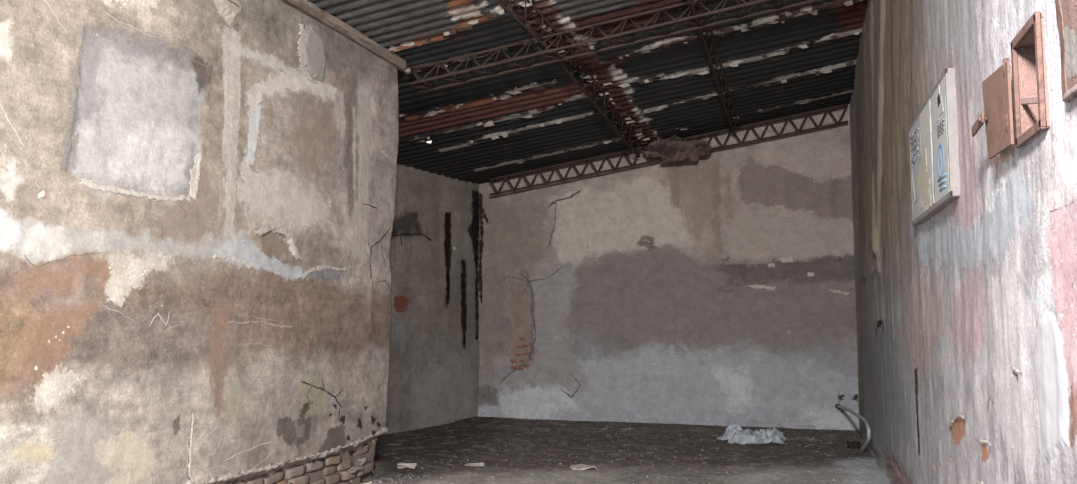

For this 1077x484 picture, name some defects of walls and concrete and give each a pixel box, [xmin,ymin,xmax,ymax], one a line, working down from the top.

peeling [385,3,505,54]
rust [402,0,685,146]
peeling [603,26,863,88]
peeling [600,0,868,66]
peeling [632,59,857,117]
rust [833,1,867,32]
water stain [928,0,979,113]
water stain [861,0,913,262]
water stain [415,158,909,455]
flaking render [711,253,855,296]
water stain [15,414,154,484]
spalling [191,404,388,484]